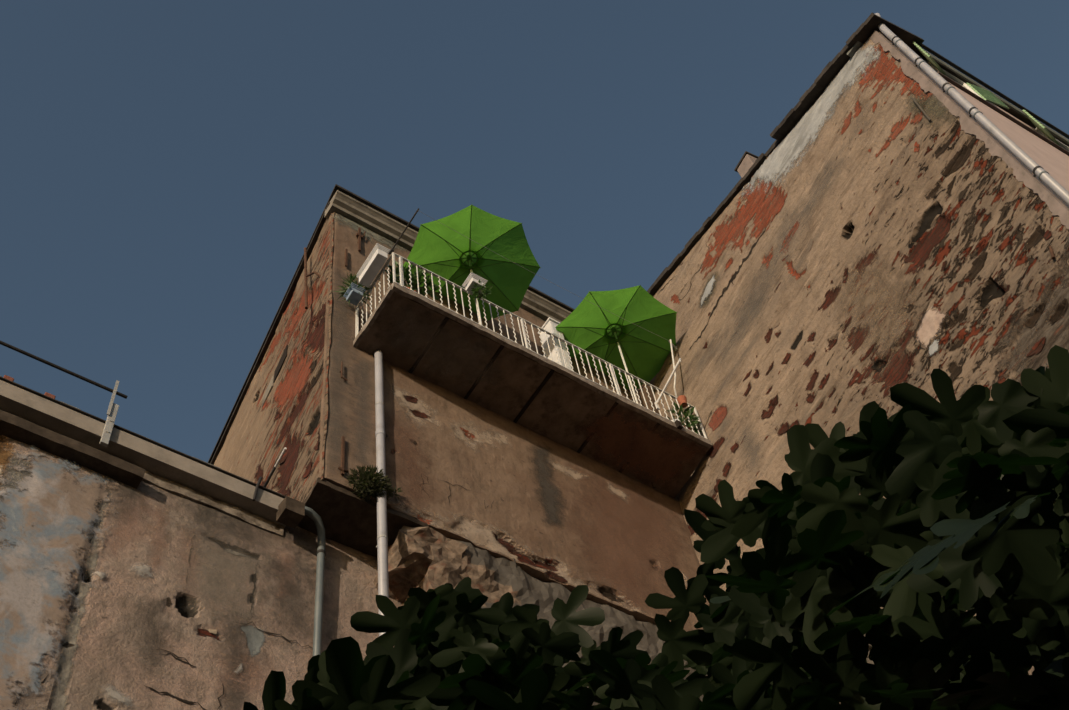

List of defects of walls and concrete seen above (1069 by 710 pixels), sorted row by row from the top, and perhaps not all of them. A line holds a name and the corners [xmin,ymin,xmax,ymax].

flaking render [840,44,933,157]
crack [659,245,709,305]
crack [689,214,777,350]
flaking render [700,176,789,308]
flaking render [900,120,976,274]
flaking render [253,276,329,496]
flaking render [743,279,1010,435]
damp [533,447,563,525]
spalling [373,499,641,611]
crack [161,649,196,667]
crack [146,681,224,710]
spalling [166,596,220,641]